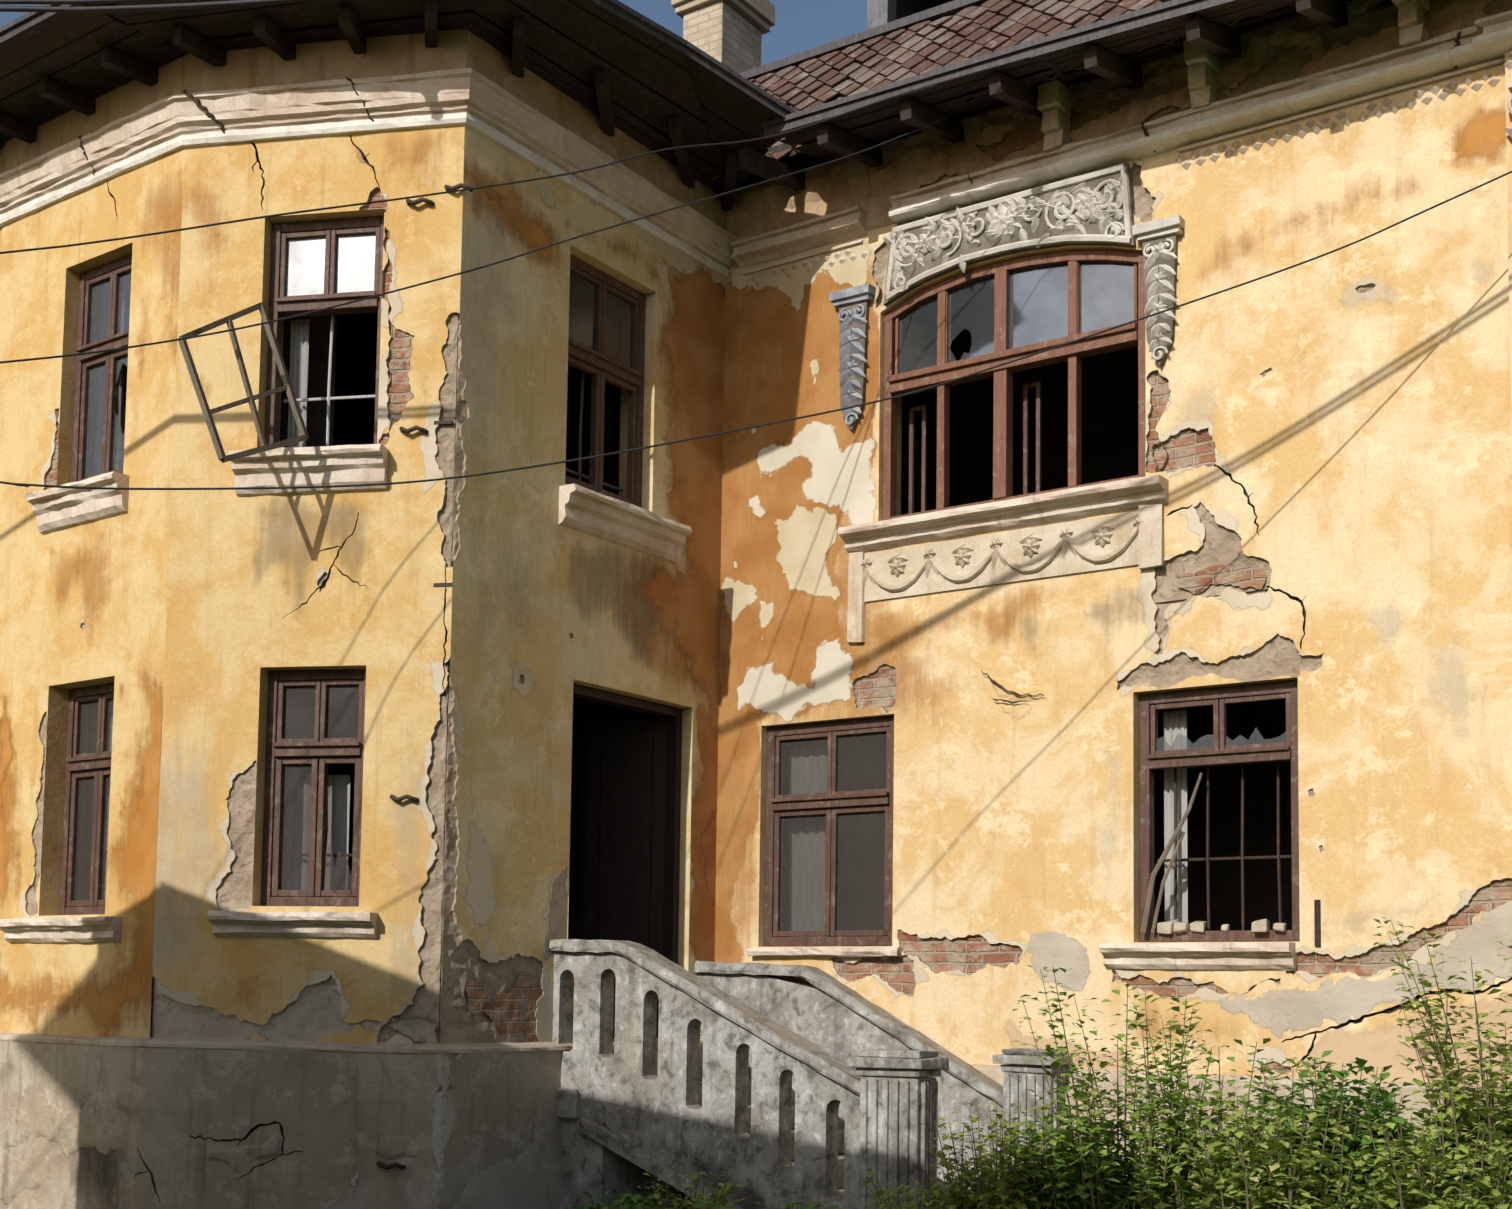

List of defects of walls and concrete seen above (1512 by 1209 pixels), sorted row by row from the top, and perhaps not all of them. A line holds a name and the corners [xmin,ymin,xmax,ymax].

crack [78,135,118,217]
crack [183,89,265,211]
crack [346,76,381,190]
flaking render [355,148,415,446]
crack [282,512,368,619]
peeling [749,421,876,600]
flaking render [1116,501,1324,696]
peeling [737,640,900,721]
flaking render [152,658,569,1201]
flaking render [831,929,1028,998]
peeling [1112,878,1512,1076]
crack [190,1121,303,1180]